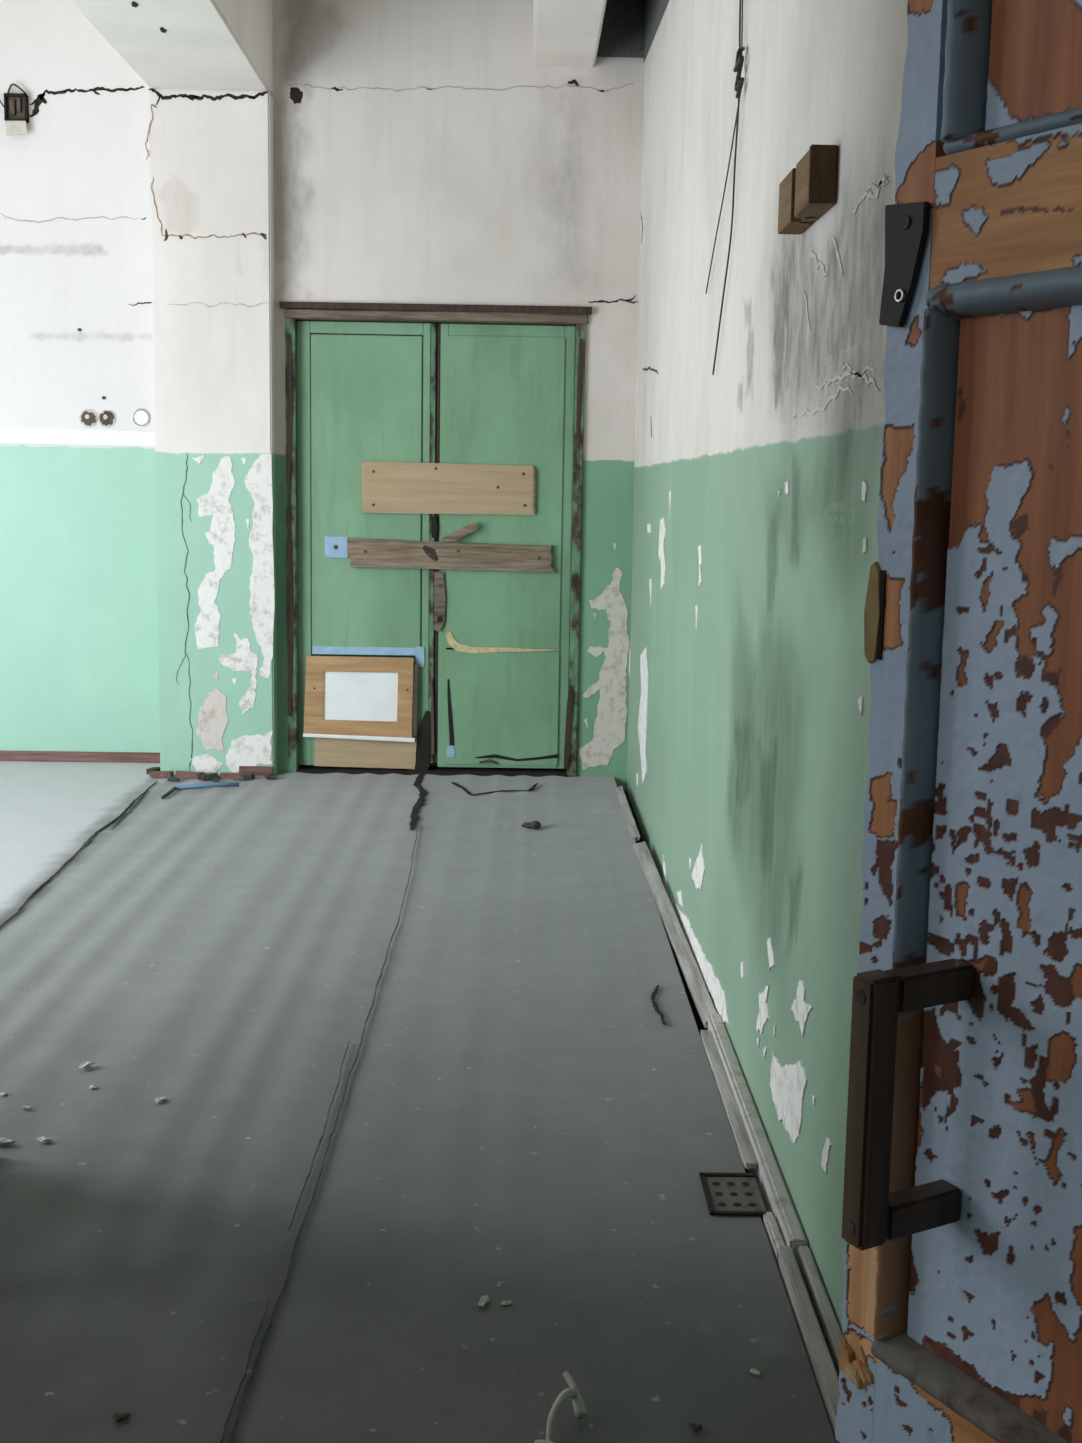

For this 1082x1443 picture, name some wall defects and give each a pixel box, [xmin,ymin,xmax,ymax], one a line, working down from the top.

crack [0,79,634,241]
crack [176,456,193,771]
peeling [191,334,293,773]
peeling [564,568,648,786]
crack [0,781,157,928]
peeling [663,844,729,1023]
crack [220,773,538,1443]
peeling [756,937,816,1144]
peeling [821,1137,832,1174]